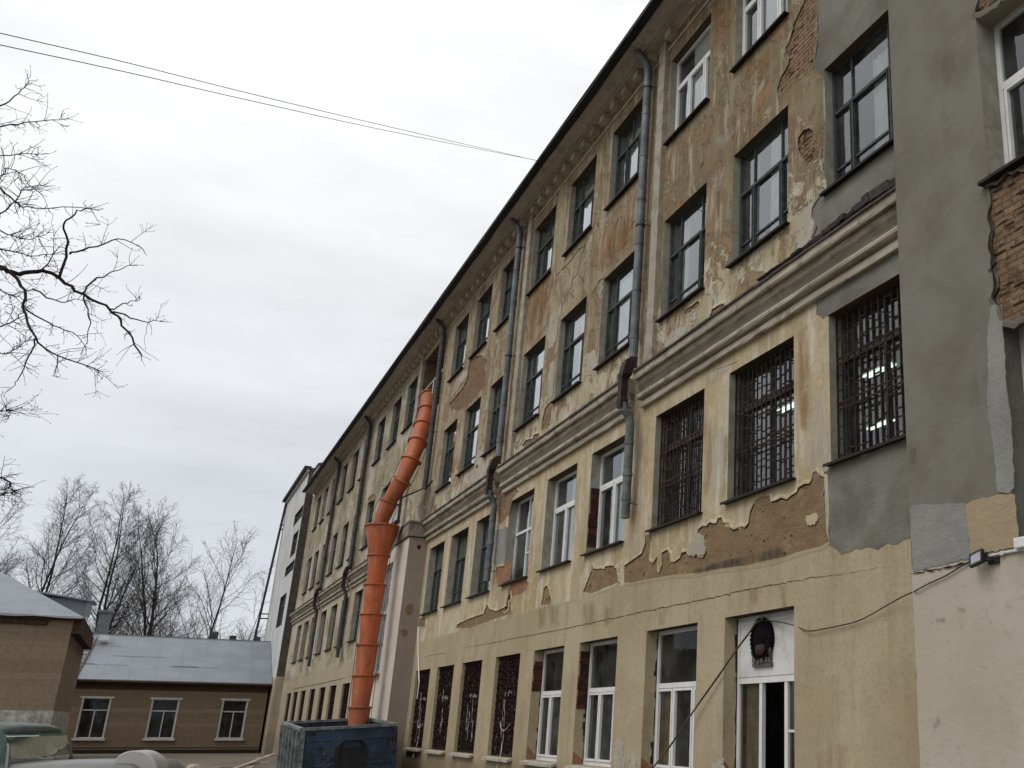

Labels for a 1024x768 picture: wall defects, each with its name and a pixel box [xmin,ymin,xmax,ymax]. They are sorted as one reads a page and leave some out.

flaking render [776,0,819,99]
flaking render [796,123,819,170]
peeling [796,205,814,248]
flaking render [980,166,1024,329]
flaking render [450,353,487,413]
spalling [583,467,830,598]
spalling [456,560,529,632]